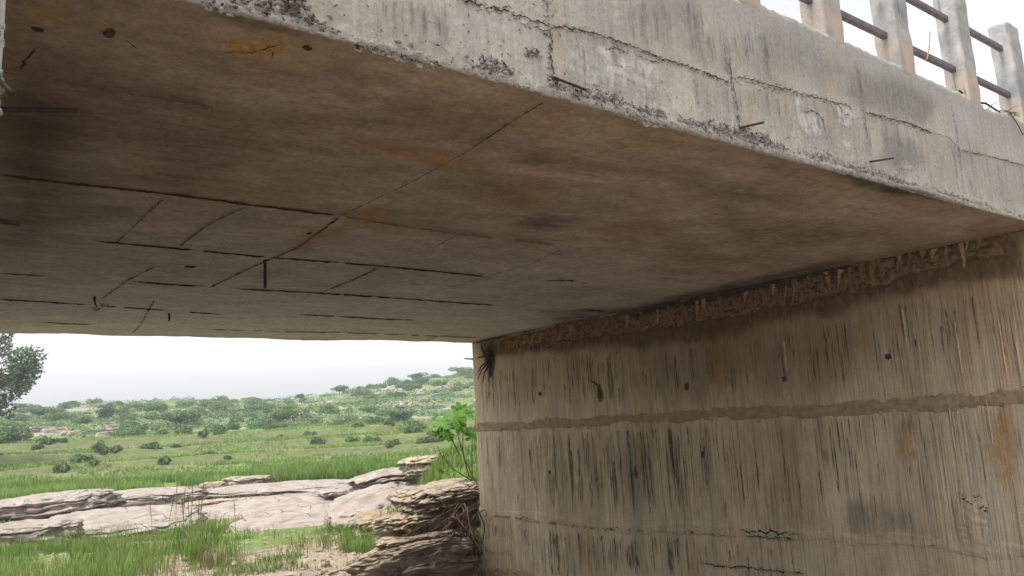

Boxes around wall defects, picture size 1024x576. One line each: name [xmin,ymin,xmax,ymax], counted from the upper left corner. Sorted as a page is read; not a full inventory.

spalling [175,0,1024,221]
crack [457,0,1024,167]
damp [518,428,767,516]
damp [815,420,862,499]
damp [524,530,714,575]
crack [703,561,808,576]
crack [740,528,797,539]